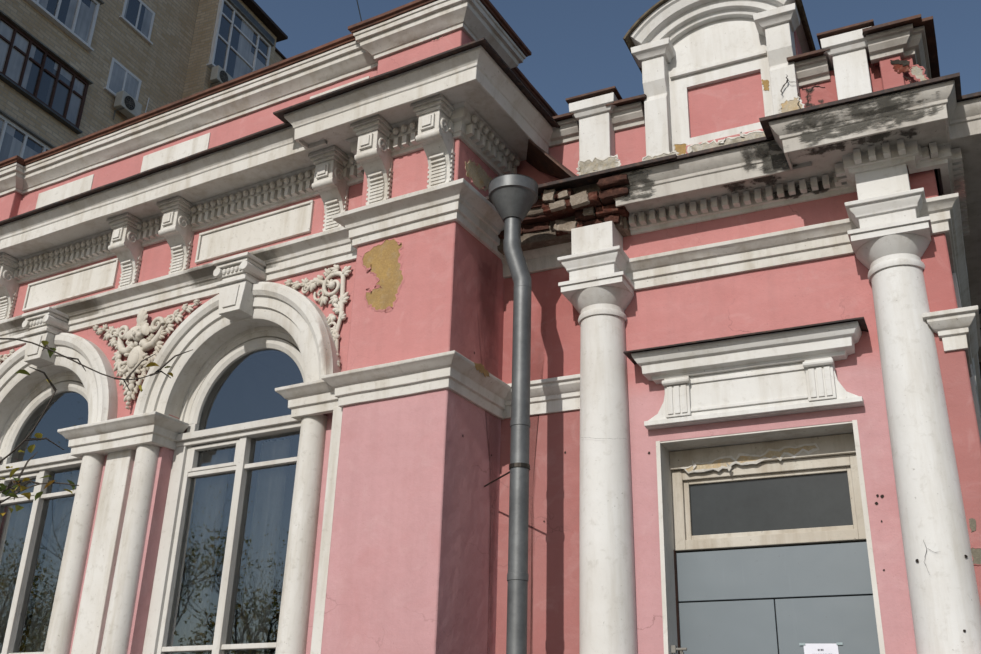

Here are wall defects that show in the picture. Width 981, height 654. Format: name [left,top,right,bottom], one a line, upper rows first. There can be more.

peeling [890,59,929,82]
peeling [779,96,805,113]
leakage [785,87,943,162]
peeling [521,155,629,236]
leakage [724,141,829,200]
peeling [361,237,405,313]
peeling [680,443,820,474]
peeling [971,546,981,566]